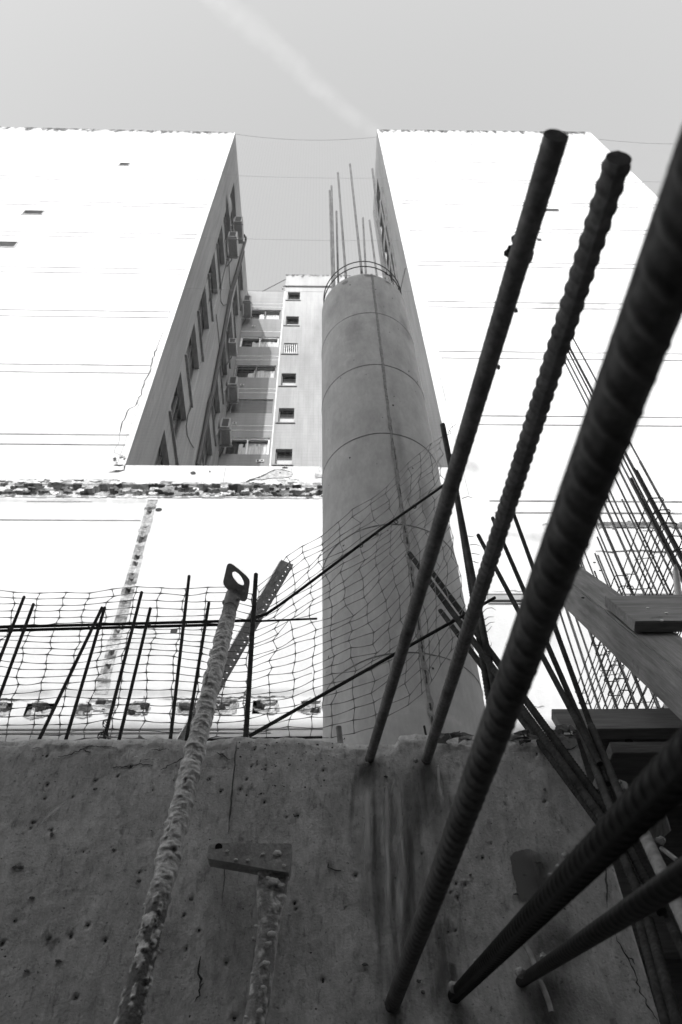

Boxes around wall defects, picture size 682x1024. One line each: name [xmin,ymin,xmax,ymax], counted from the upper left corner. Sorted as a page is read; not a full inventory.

spalling [0,455,322,511]
water stain [385,790,403,914]